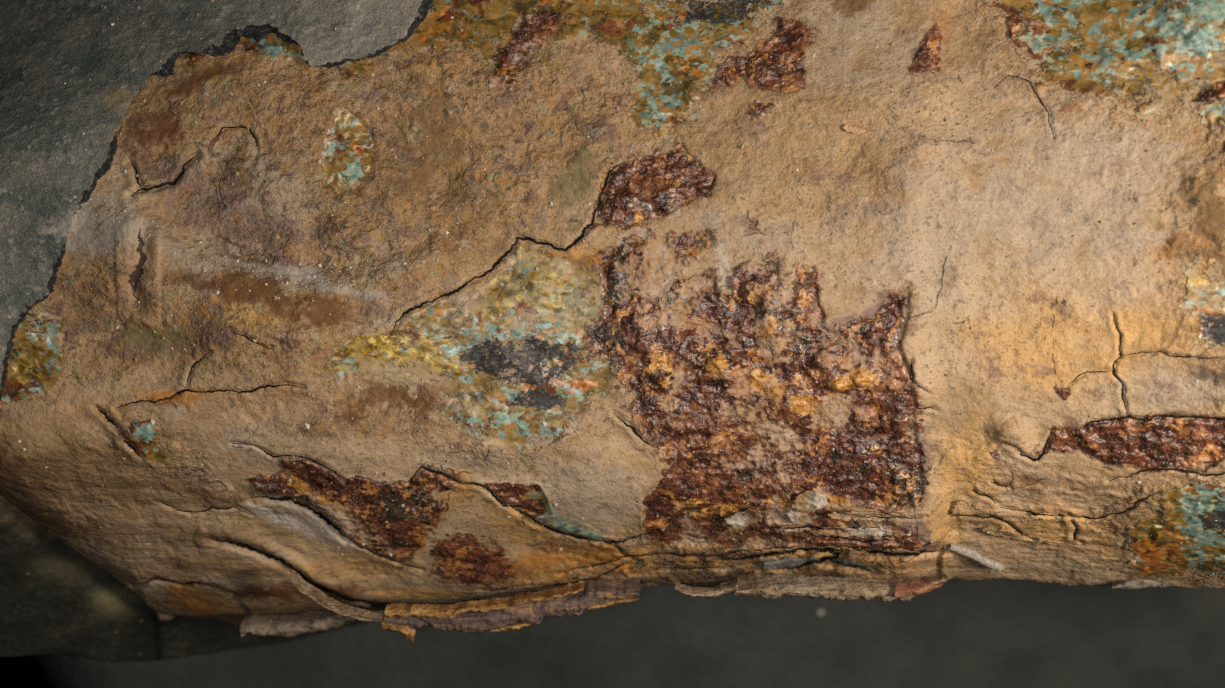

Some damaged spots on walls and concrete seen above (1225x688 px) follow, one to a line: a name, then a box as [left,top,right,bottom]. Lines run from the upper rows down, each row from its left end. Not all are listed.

peeling [149,0,789,150]
rust [710,12,820,118]
rust [907,20,943,76]
peeling [984,0,1225,134]
crack [386,164,622,336]
crack [97,352,305,457]
peeling [245,236,663,541]
rust [240,140,948,638]
rust [1037,411,1225,477]
crack [1069,314,1225,428]
crack [410,466,1225,591]
peeling [1112,462,1225,586]